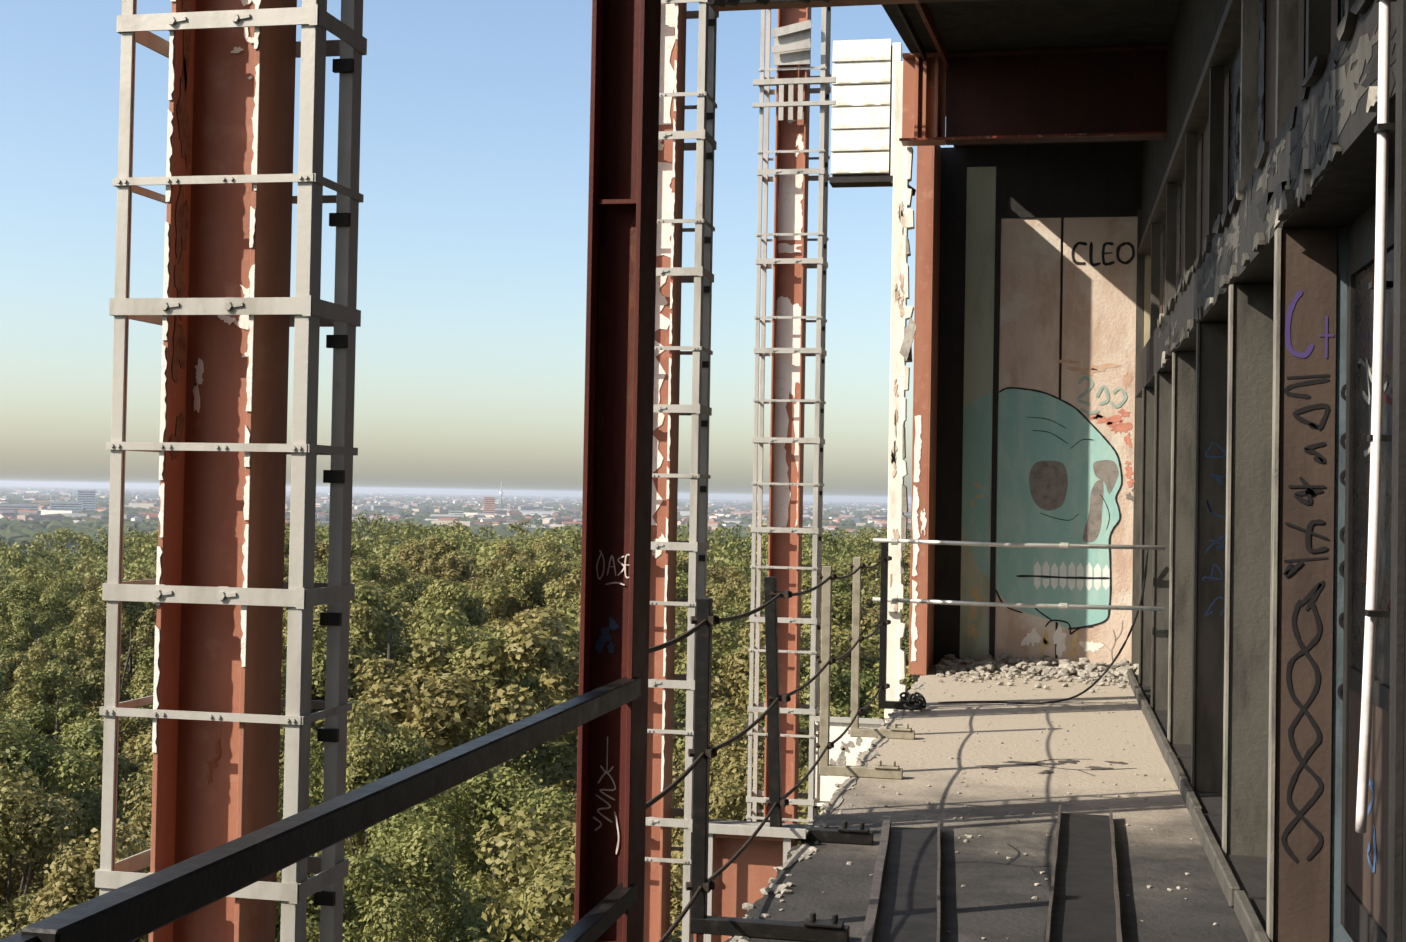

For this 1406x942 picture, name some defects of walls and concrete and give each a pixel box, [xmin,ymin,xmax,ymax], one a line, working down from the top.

peeling [170,0,191,12]
peeling [241,0,261,9]
peeling [163,29,191,298]
peeling [230,27,260,298]
peeling [777,168,803,253]
peeling [787,119,804,157]
peeling [156,315,204,584]
peeling [218,315,254,588]
peeling [772,296,801,527]
spalling [783,146,927,868]
peeling [152,625,160,753]